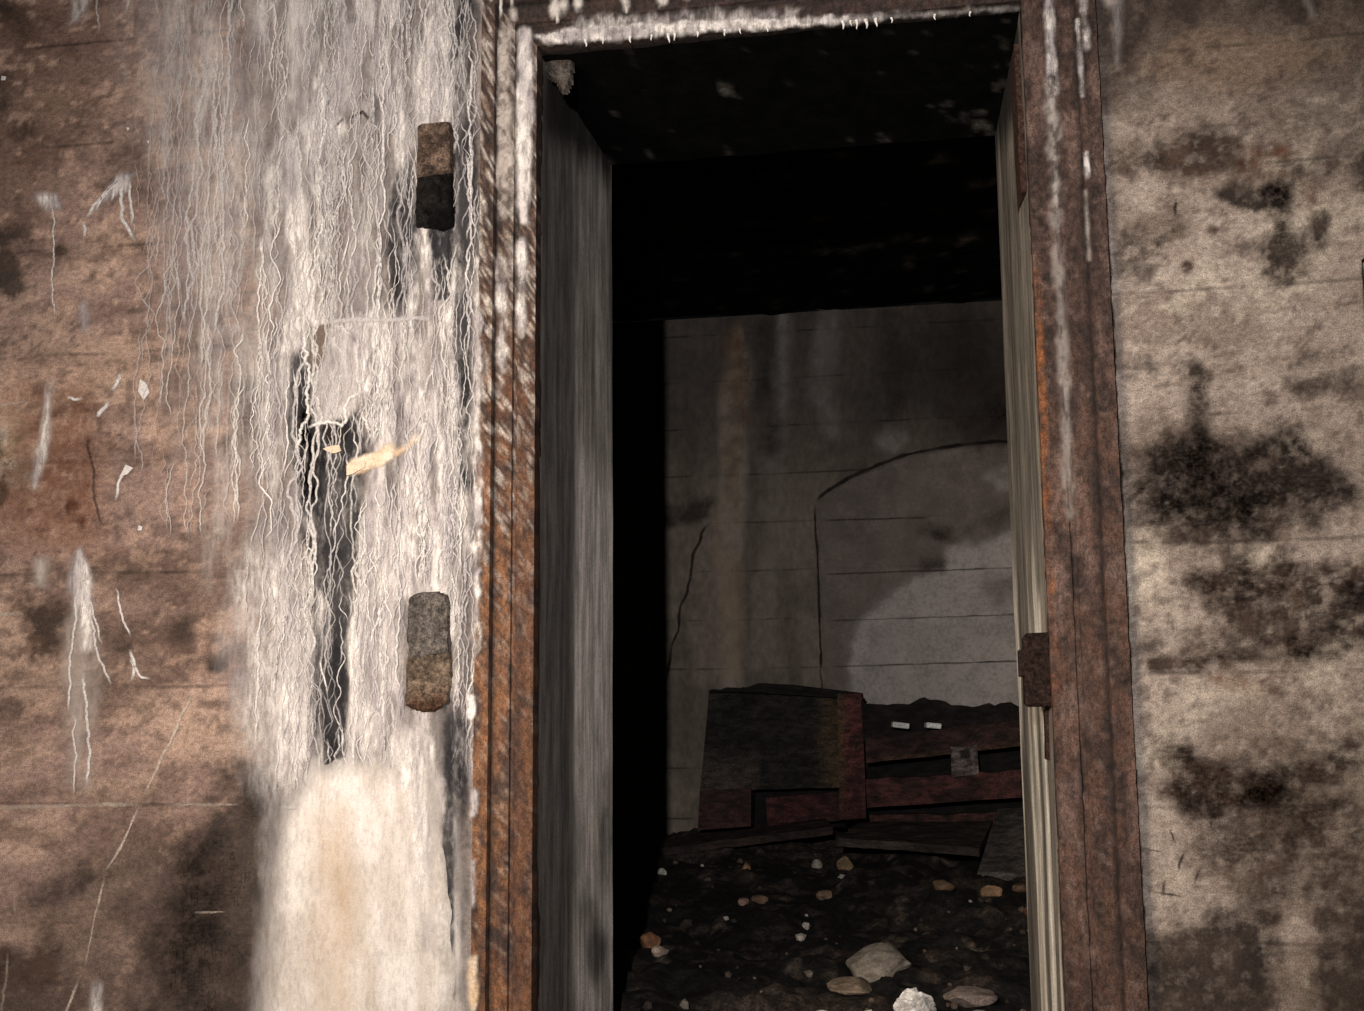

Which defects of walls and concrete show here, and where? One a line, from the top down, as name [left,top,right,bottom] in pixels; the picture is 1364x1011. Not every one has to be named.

water stain [0,229,28,298]
water stain [51,210,65,311]
water stain [83,177,138,237]
water stain [1116,130,1328,284]
water stain [134,0,479,1011]
water stain [21,548,110,788]
crack [666,529,705,674]
water stain [1140,553,1364,672]
water stain [1147,741,1364,1011]